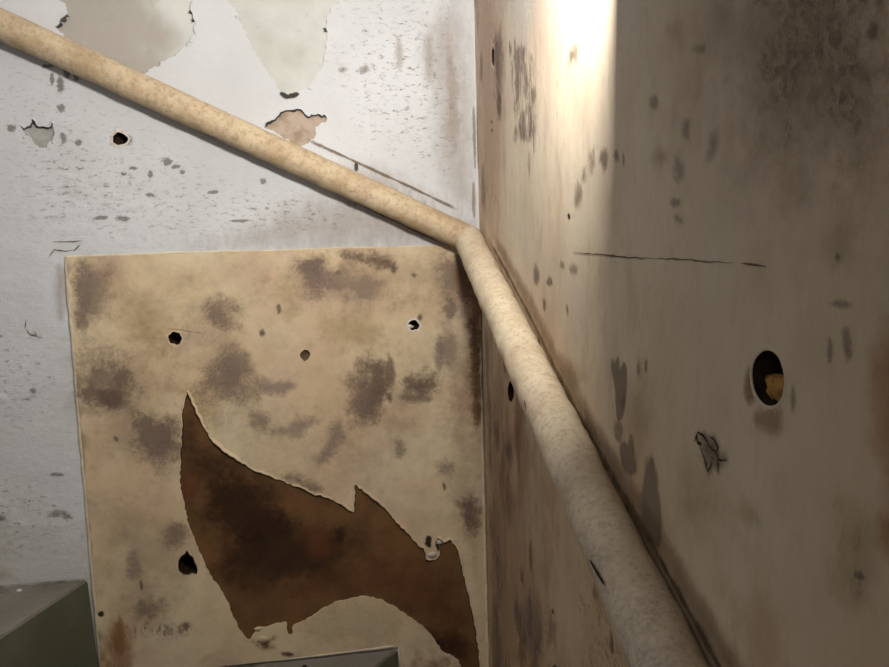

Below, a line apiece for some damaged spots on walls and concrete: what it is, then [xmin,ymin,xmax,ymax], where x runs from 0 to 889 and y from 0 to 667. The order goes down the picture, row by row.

peeling [56,0,198,74]
peeling [42,64,79,91]
peeling [225,0,347,146]
peeling [8,116,81,155]
water stain [344,253,394,268]
crack [572,252,767,267]
water stain [350,358,394,423]
water stain [403,378,435,401]
water stain [440,260,511,469]
water stain [611,359,627,420]
water stain [620,435,661,546]
water stain [432,635,461,657]